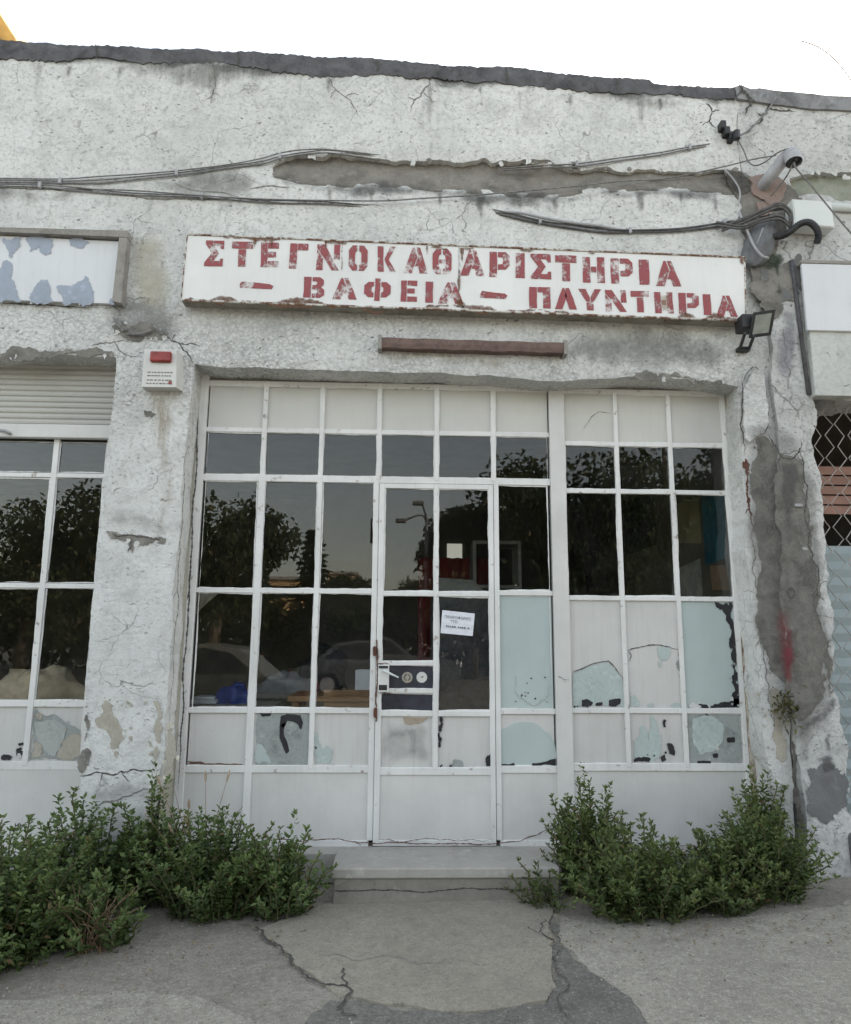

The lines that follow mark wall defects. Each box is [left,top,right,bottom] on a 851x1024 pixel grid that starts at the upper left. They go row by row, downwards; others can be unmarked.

crack [329,78,358,115]
crack [409,79,432,109]
spalling [272,152,851,319]
spalling [109,298,167,342]
spalling [106,531,166,553]
crack [83,419,199,806]
crack [740,332,821,835]
peeling [741,436,834,762]
peeling [1,697,180,782]
crack [255,926,479,1015]
crack [528,919,570,1016]